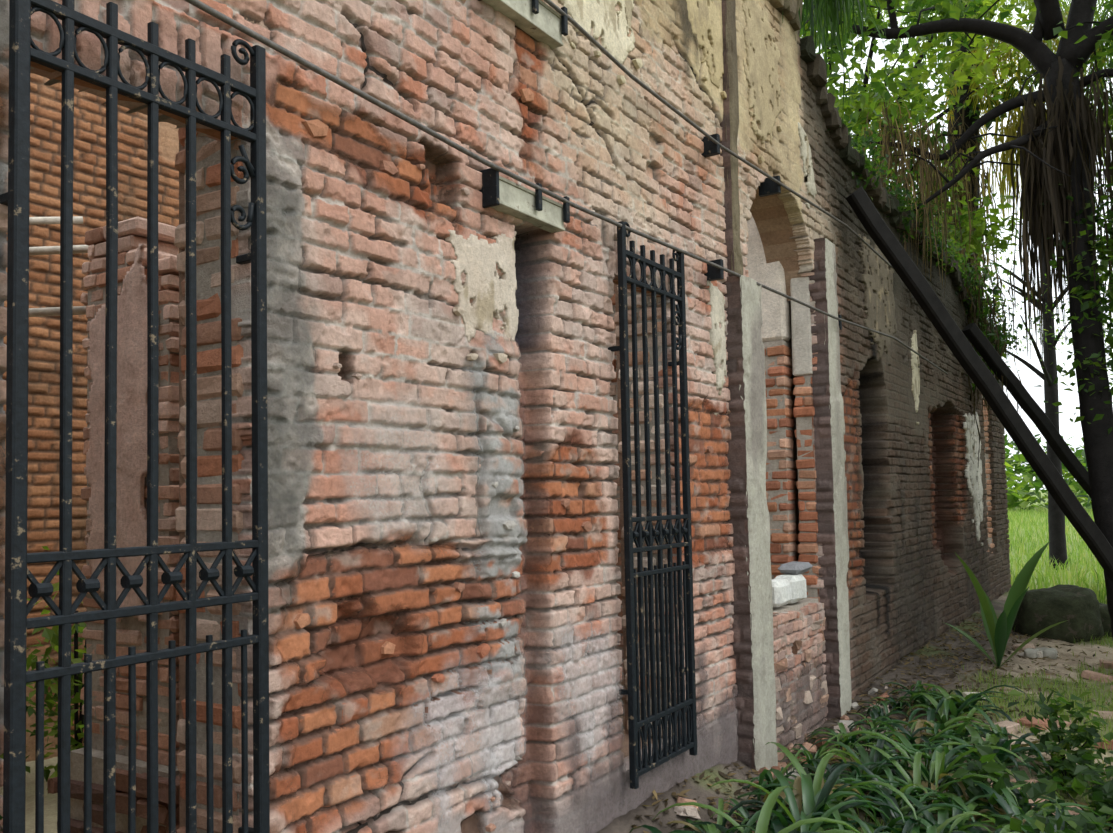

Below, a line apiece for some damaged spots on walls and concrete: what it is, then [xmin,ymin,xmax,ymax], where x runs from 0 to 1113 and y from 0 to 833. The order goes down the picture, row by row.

crack [349,21,410,102]
spalling [513,25,543,167]
flaking render [557,0,642,85]
flaking render [686,0,727,99]
flaking render [742,0,782,164]
flaking render [798,122,817,208]
spalling [266,70,519,364]
spalling [333,354,362,381]
spalling [269,434,606,833]